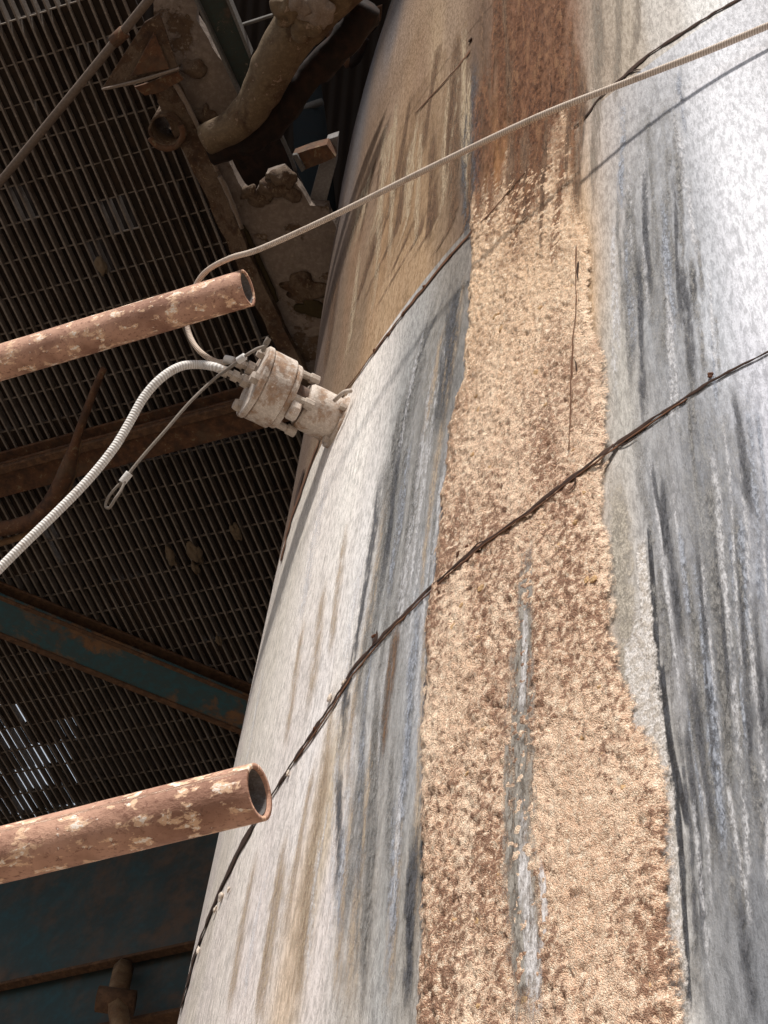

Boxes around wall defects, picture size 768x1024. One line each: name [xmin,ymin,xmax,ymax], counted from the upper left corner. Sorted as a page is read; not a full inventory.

water stain [307,277,463,995]
water stain [348,44,479,340]
rust [472,0,587,262]
spalling [416,109,689,1024]
water stain [590,0,641,186]
water stain [612,75,768,1013]